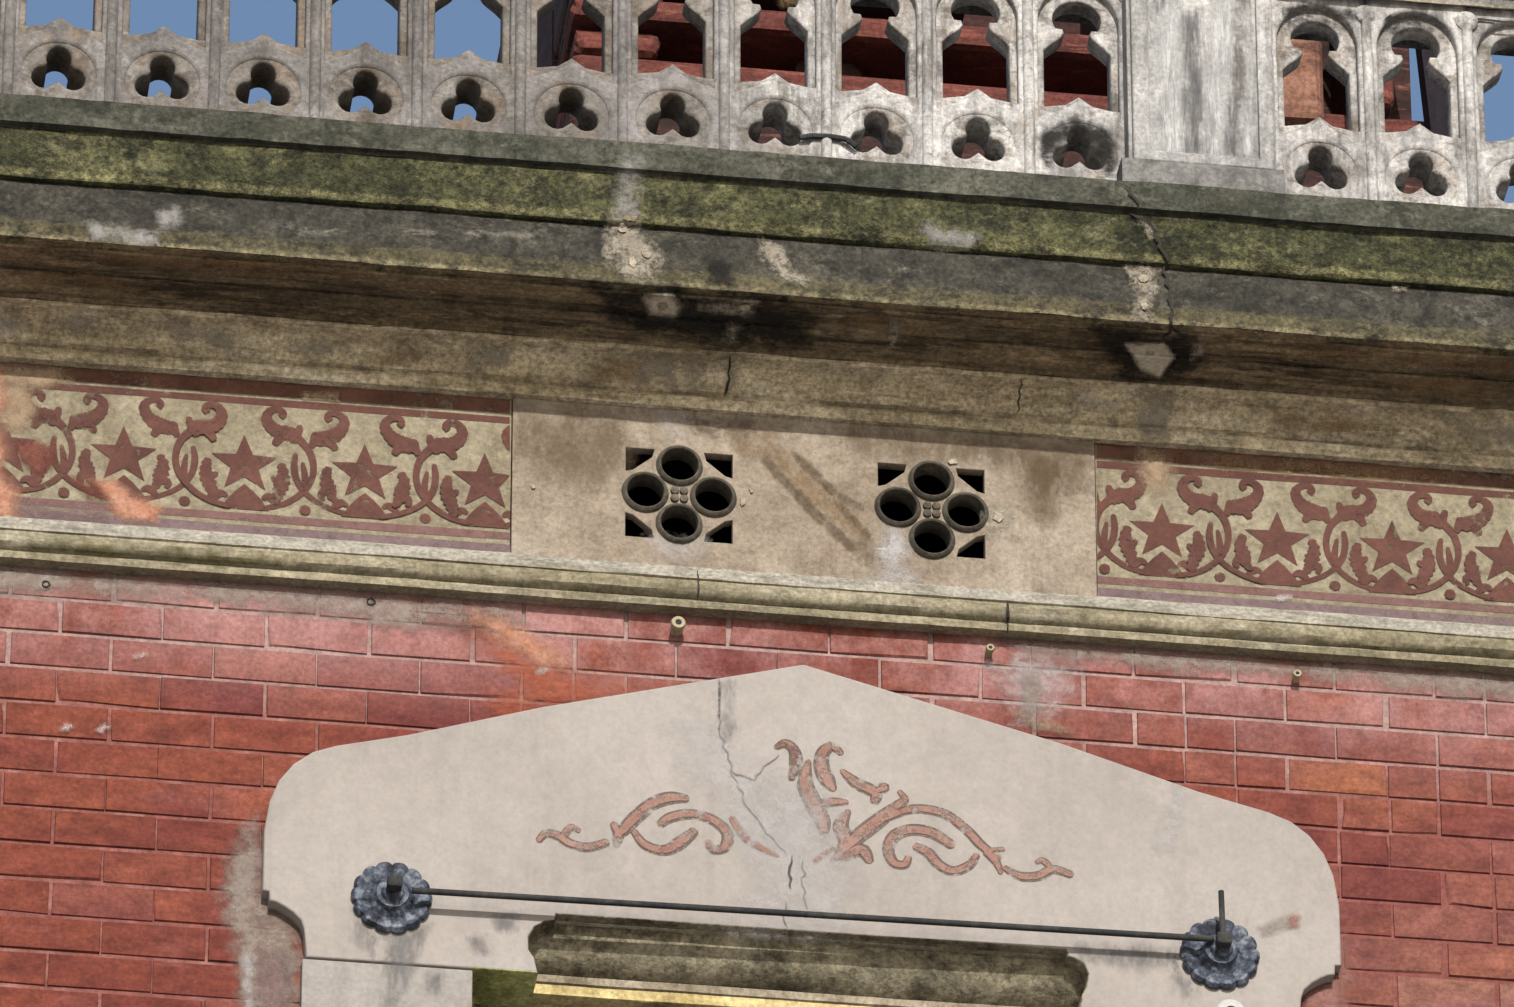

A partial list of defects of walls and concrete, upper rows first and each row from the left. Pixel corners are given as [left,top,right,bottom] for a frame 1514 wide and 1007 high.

spalling [1090,266,1205,381]
crack [1125,185,1189,344]
peeling [0,365,160,521]
crack [718,679,808,928]